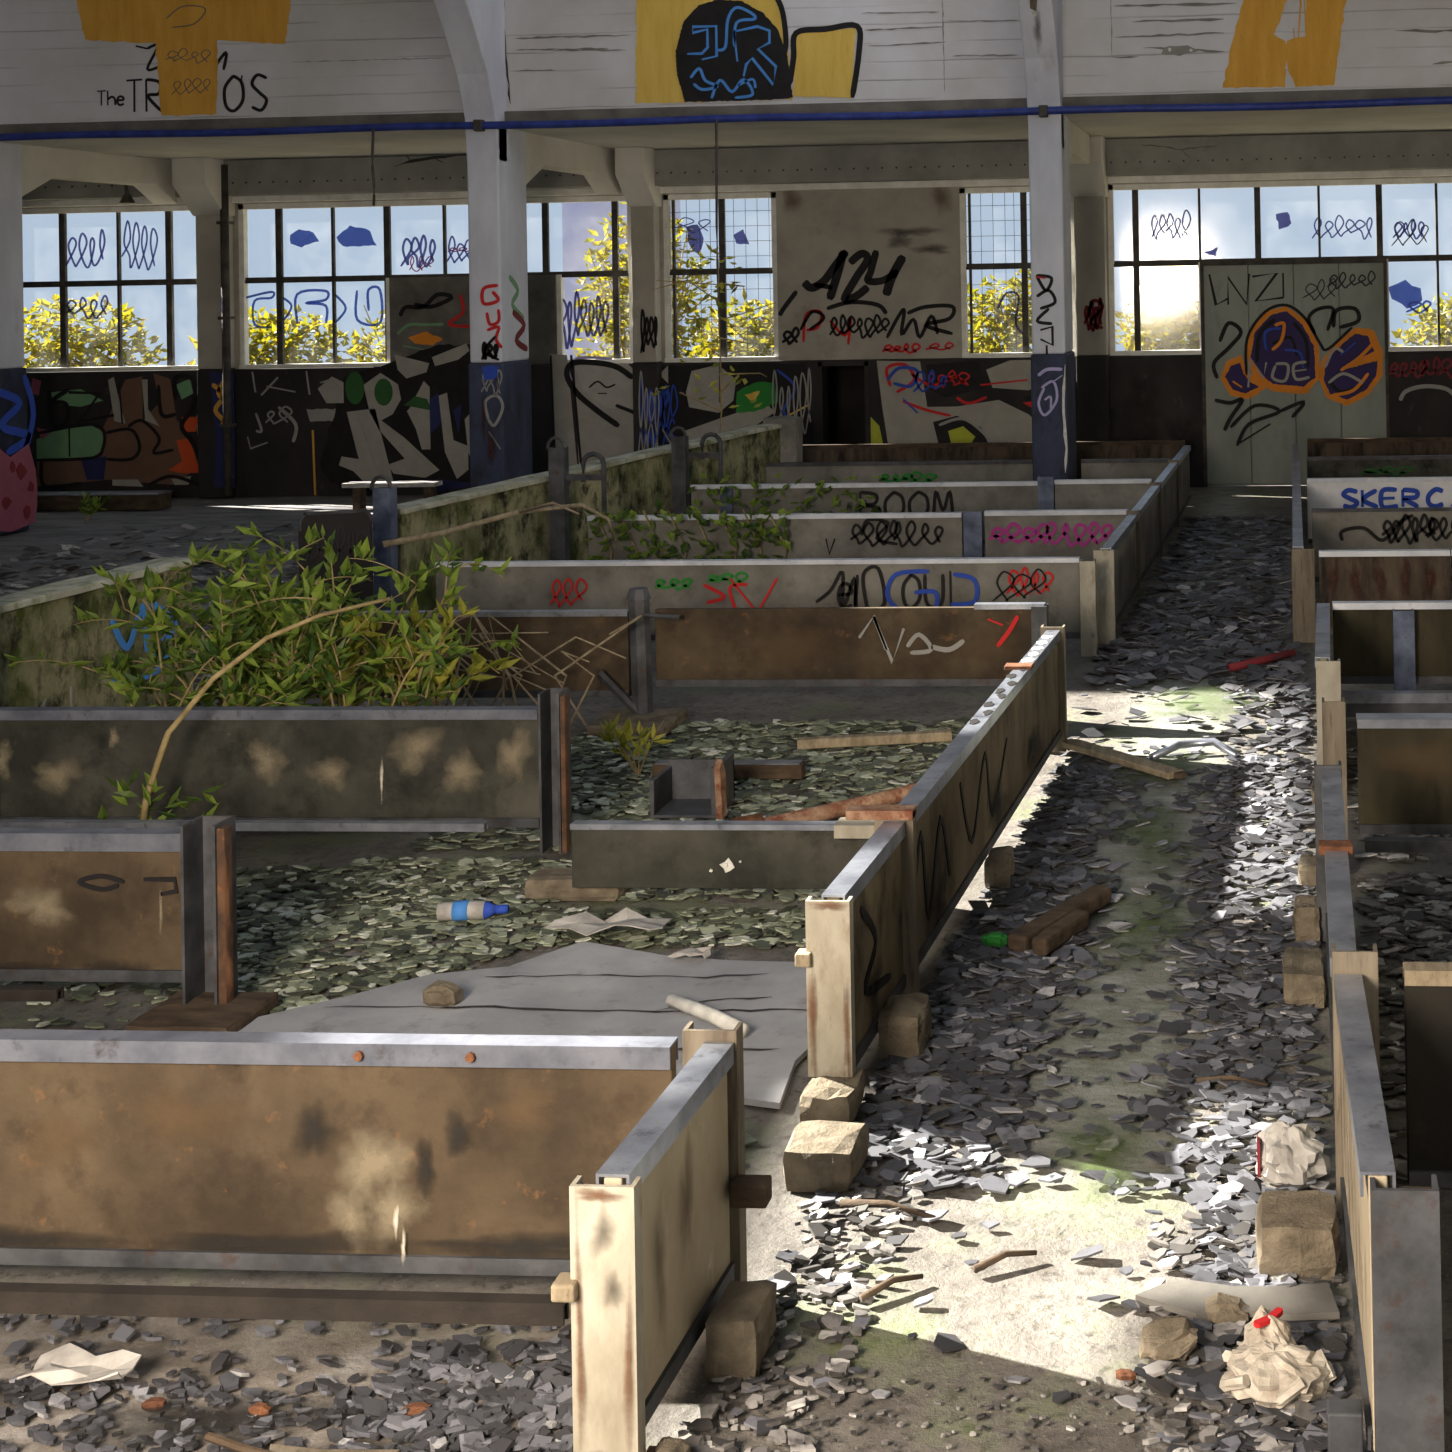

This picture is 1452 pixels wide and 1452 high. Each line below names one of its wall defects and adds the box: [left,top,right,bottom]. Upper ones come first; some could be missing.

peeling [1161,45,1200,56]